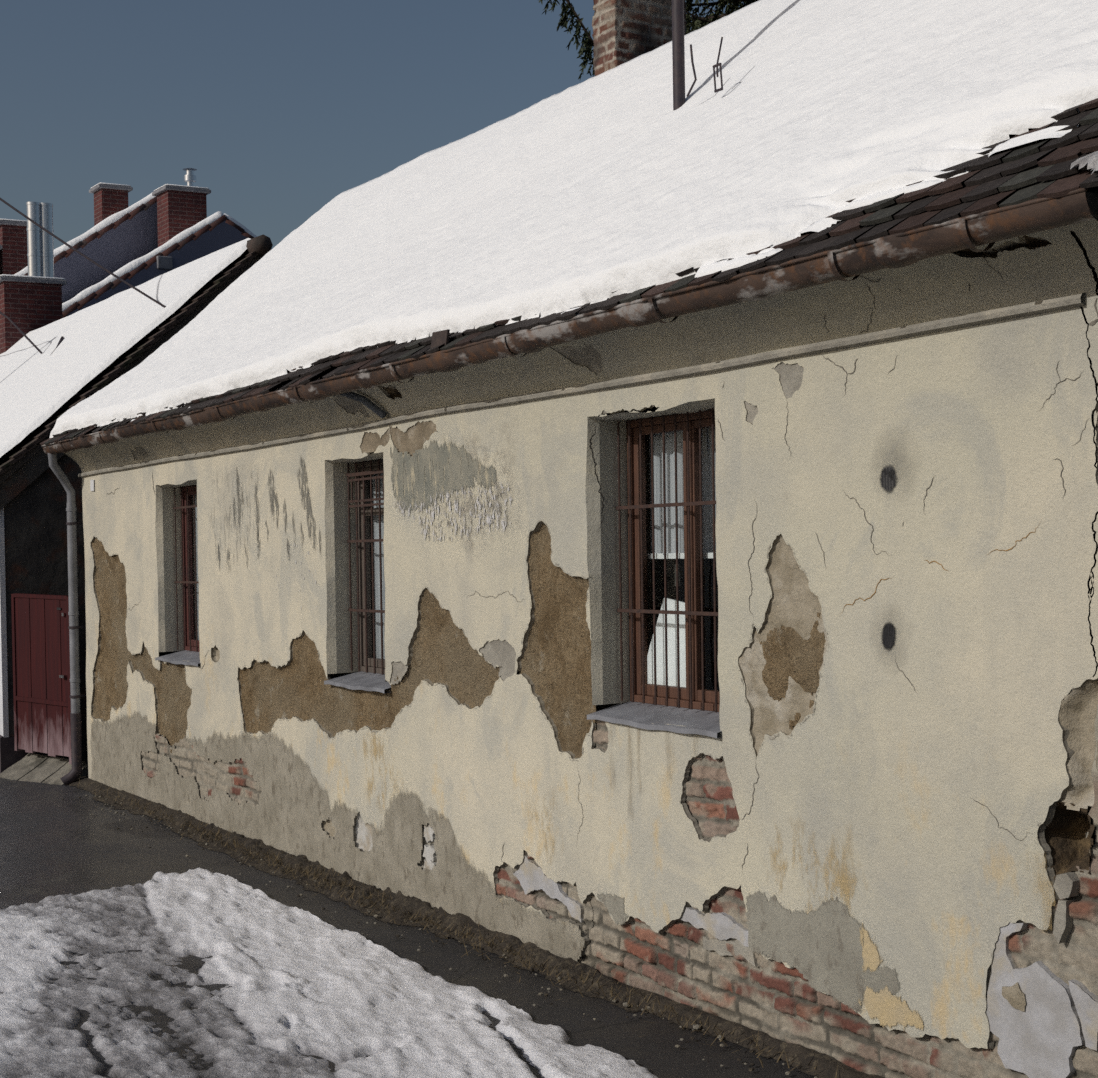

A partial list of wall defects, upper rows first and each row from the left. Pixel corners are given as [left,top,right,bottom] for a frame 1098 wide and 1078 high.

crack [1073,232,1098,326]
crack [1040,360,1085,410]
water stain [215,459,321,608]
peeling [360,420,512,541]
crack [1054,418,1089,499]
flaking render [90,521,1098,1078]